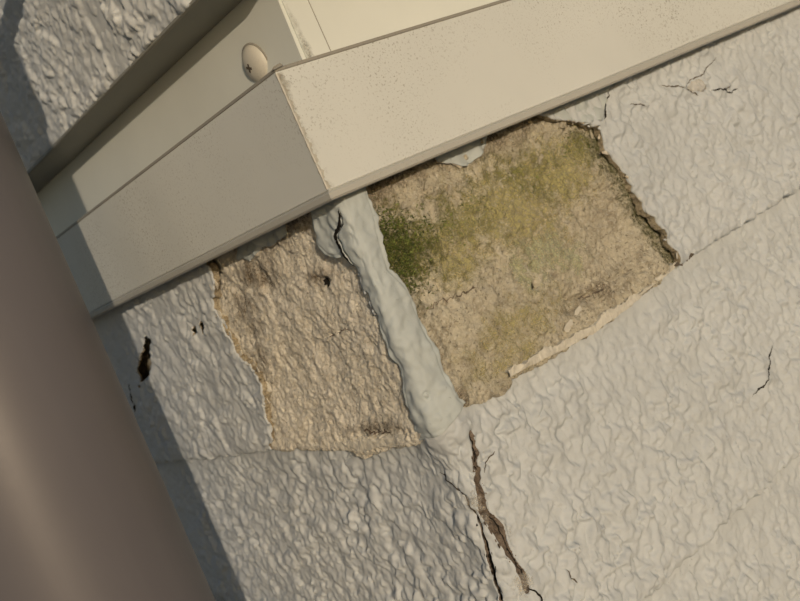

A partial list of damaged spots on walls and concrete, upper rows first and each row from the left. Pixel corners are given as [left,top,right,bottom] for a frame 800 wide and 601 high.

crack [660,58,736,96]
spalling [366,84,694,407]
spalling [209,212,423,460]
crack [753,346,773,395]
crack [440,430,543,601]